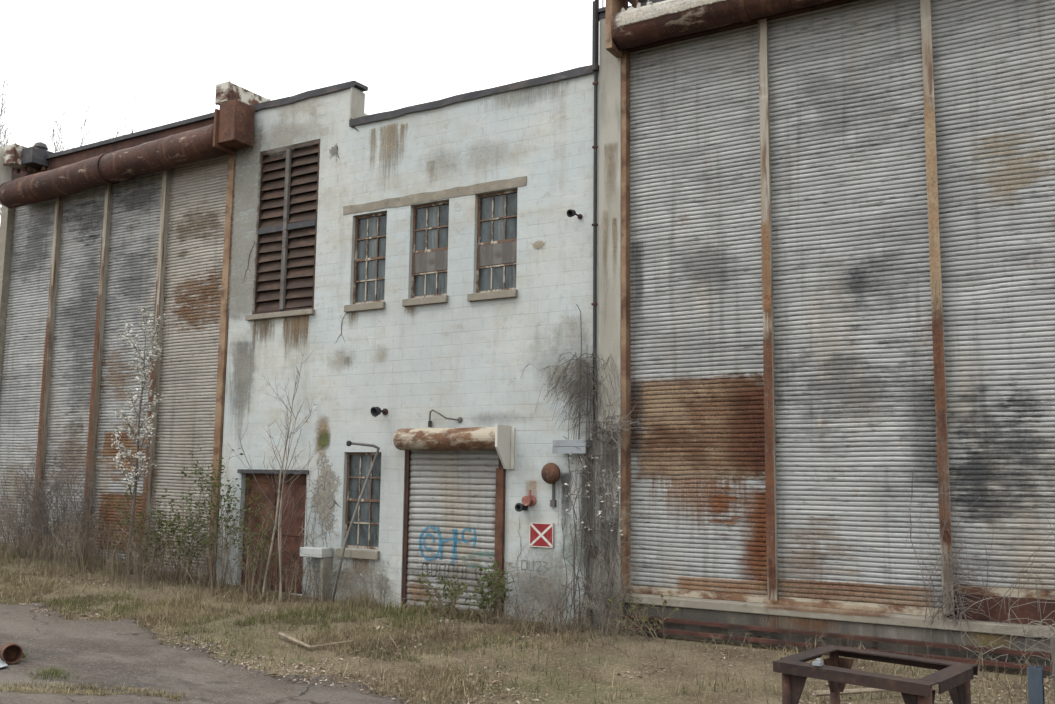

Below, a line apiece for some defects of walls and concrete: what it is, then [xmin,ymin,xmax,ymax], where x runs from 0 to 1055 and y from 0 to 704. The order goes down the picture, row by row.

leakage [371,124,407,167]
corrosion [154,265,223,332]
leakage [230,319,274,412]
corrosion [631,221,933,629]
leakage [1009,391,1041,417]
leakage [957,457,990,518]